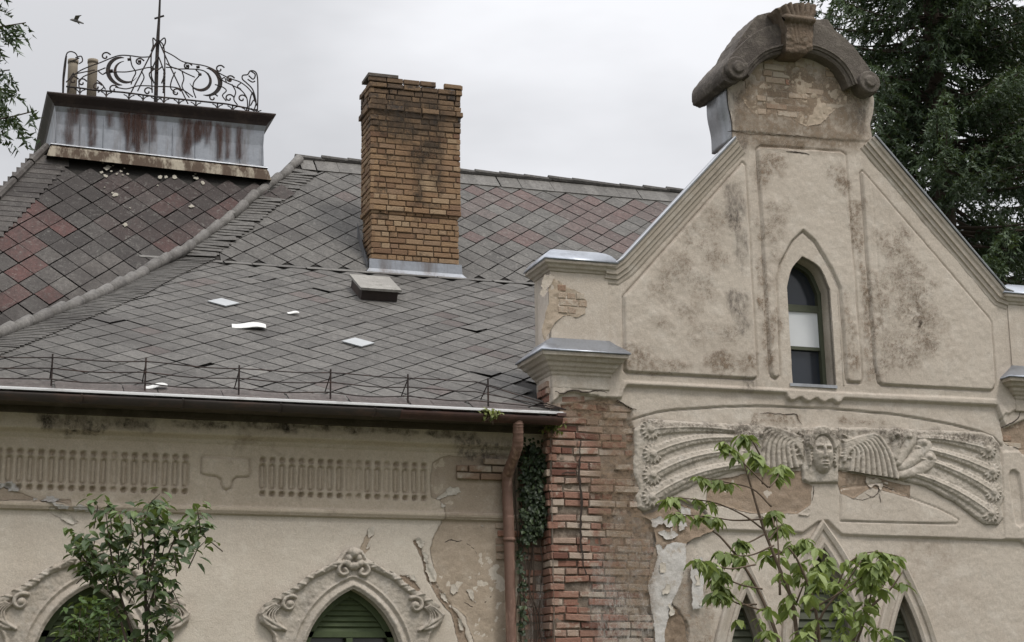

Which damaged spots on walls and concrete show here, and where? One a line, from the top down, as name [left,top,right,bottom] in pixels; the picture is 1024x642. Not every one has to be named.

flaking render [743,58,851,127]
corrosion [66,109,156,154]
corrosion [183,120,241,158]
flaking render [539,274,587,340]
flaking render [0,481,99,525]
flaking render [400,381,714,642]